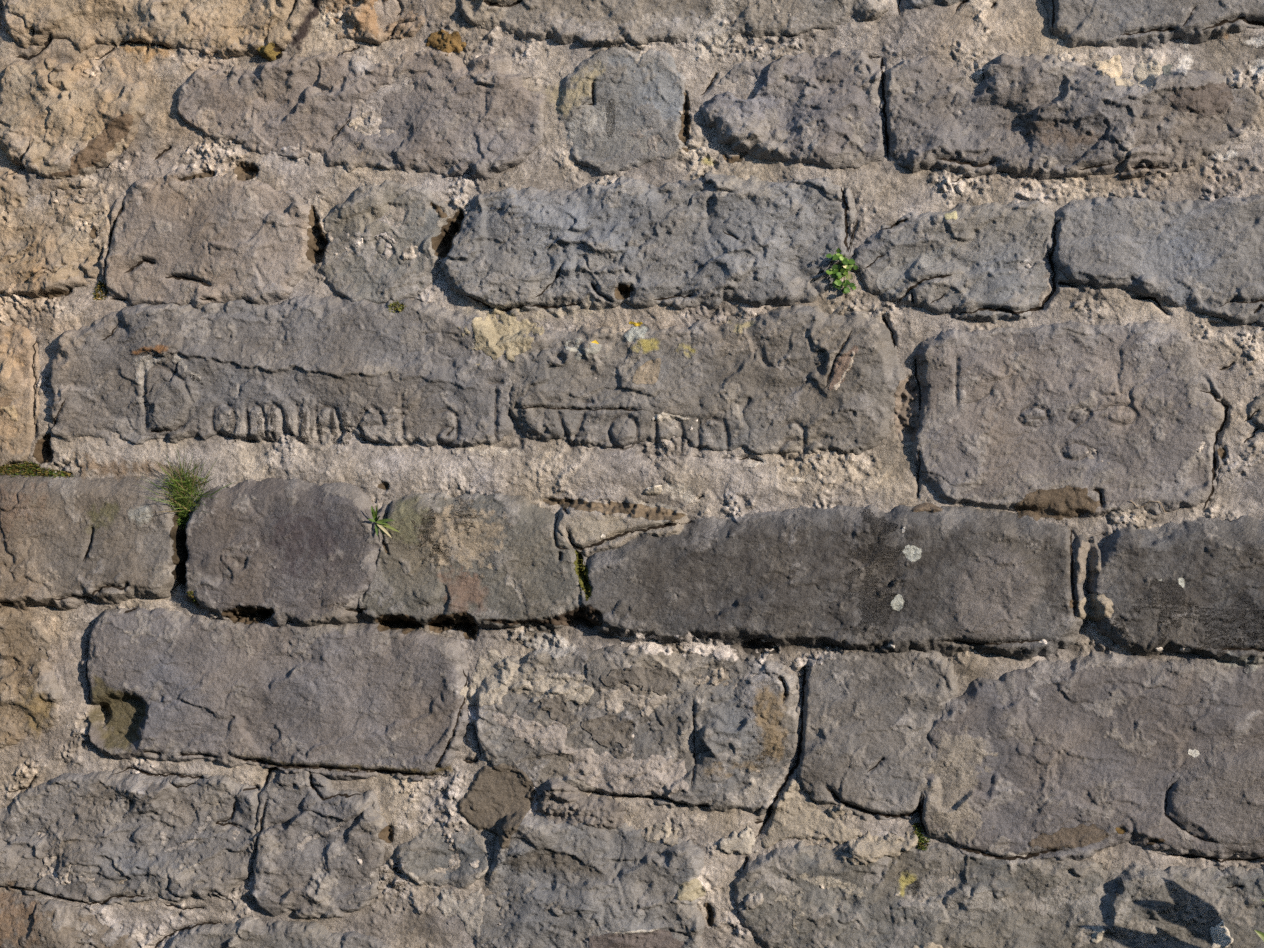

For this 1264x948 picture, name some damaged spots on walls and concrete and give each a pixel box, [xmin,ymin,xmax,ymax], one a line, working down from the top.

crack [554,496,703,560]
crack [743,661,806,870]